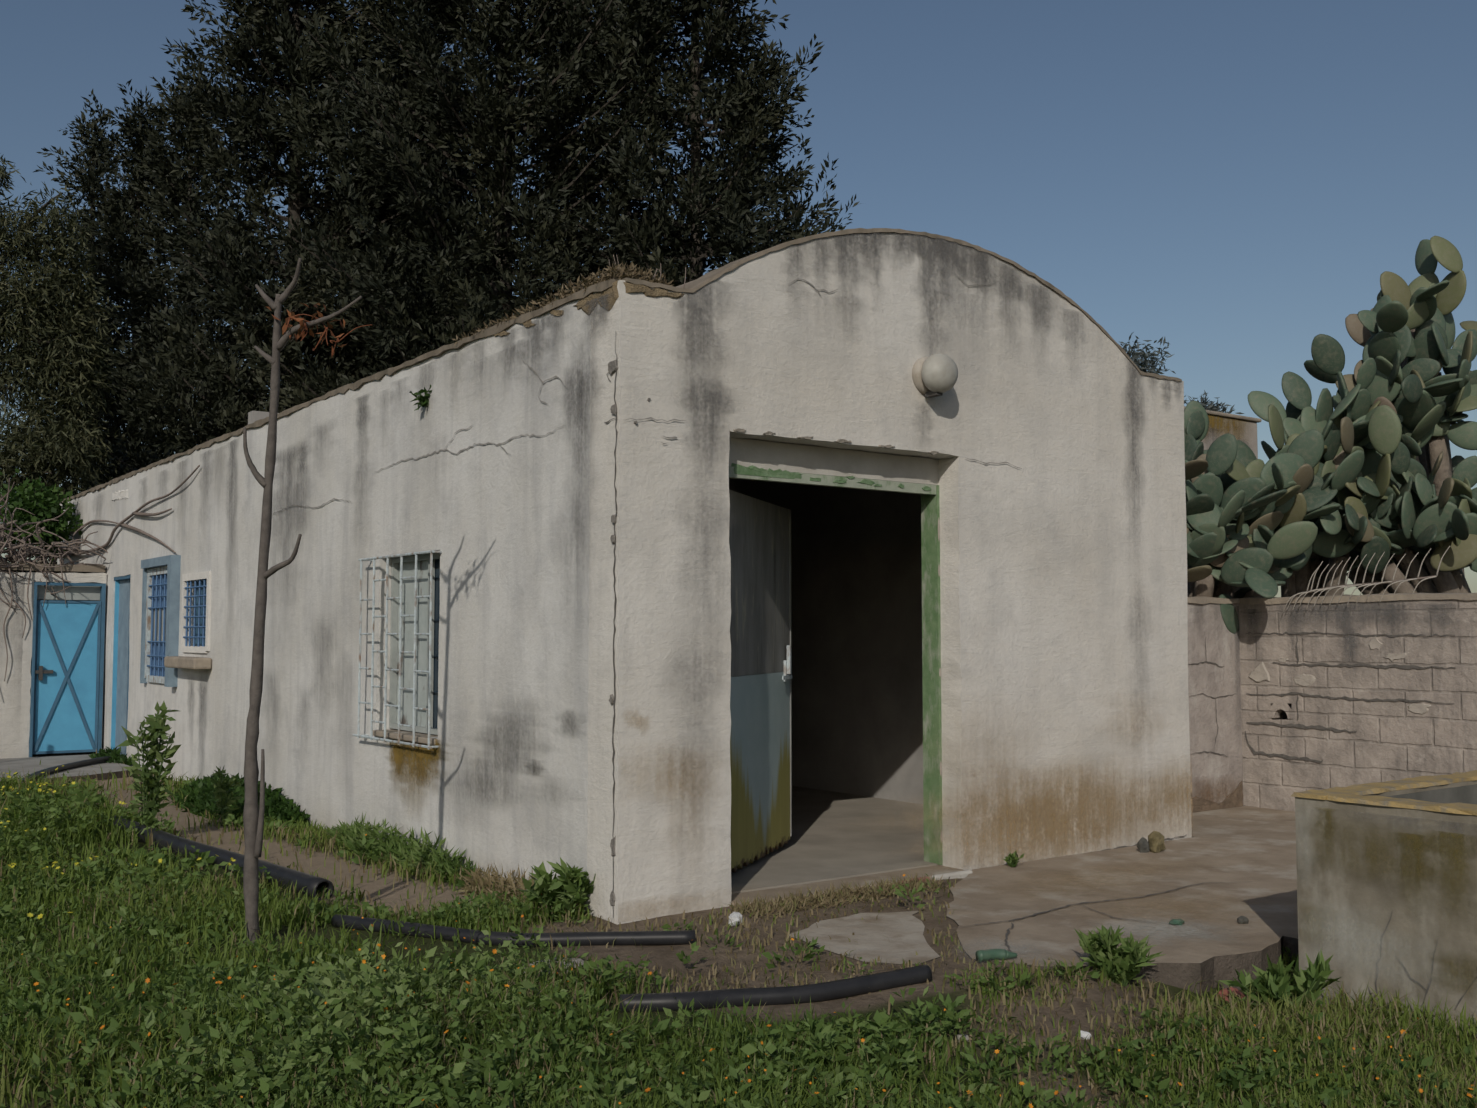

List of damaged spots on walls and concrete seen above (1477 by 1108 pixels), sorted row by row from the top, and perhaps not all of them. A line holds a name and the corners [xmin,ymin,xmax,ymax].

flaking render [494,320,536,337]
flaking render [550,280,684,317]
leakage [838,233,987,317]
crack [375,360,567,472]
crack [273,498,351,514]
crack [604,339,686,849]
corrosion [390,740,438,784]
crack [955,882,1219,960]